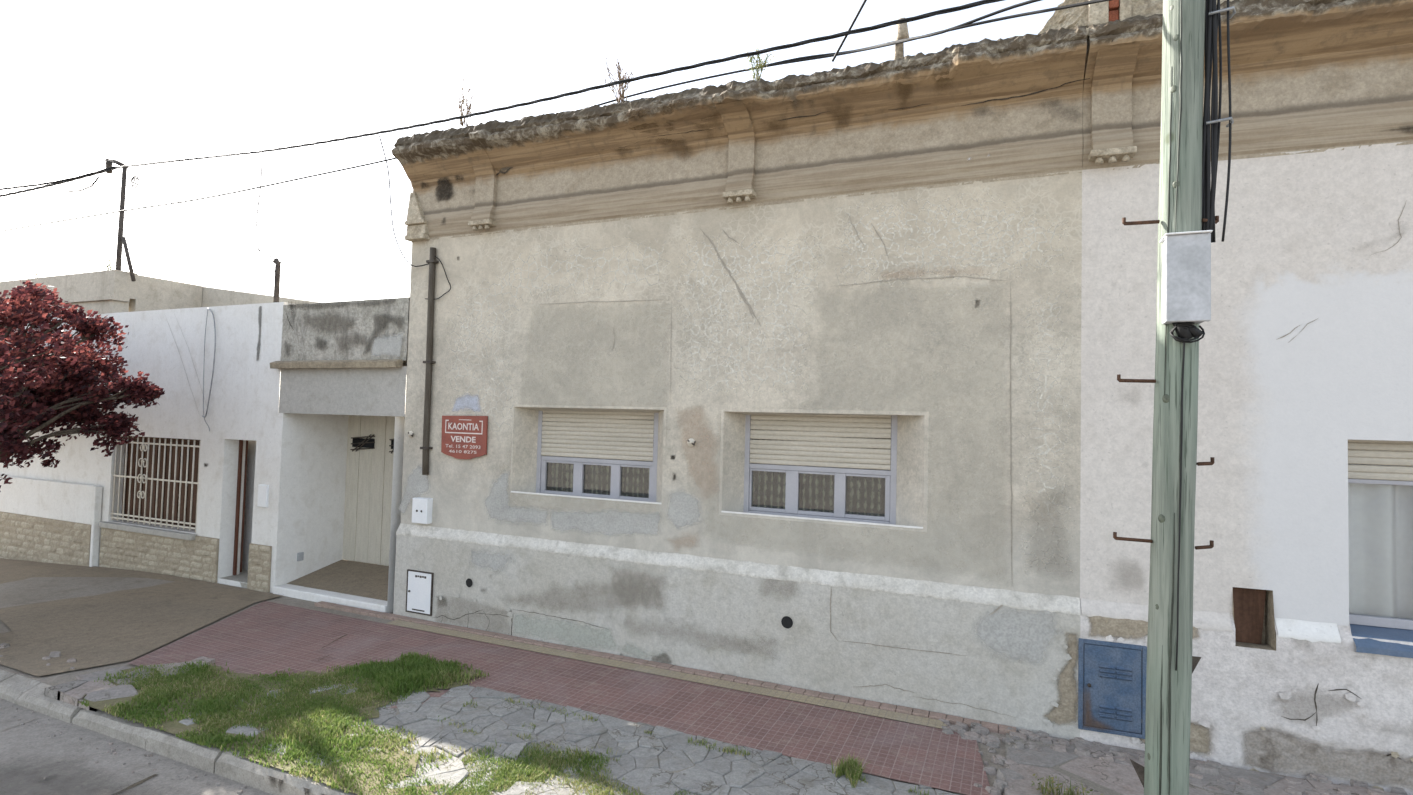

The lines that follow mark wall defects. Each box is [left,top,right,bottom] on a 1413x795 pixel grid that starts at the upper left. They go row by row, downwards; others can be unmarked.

crack [539,201,1055,568]
spalling [1042,616,1148,728]
spalling [1190,719,1211,759]
spalling [1245,726,1413,791]